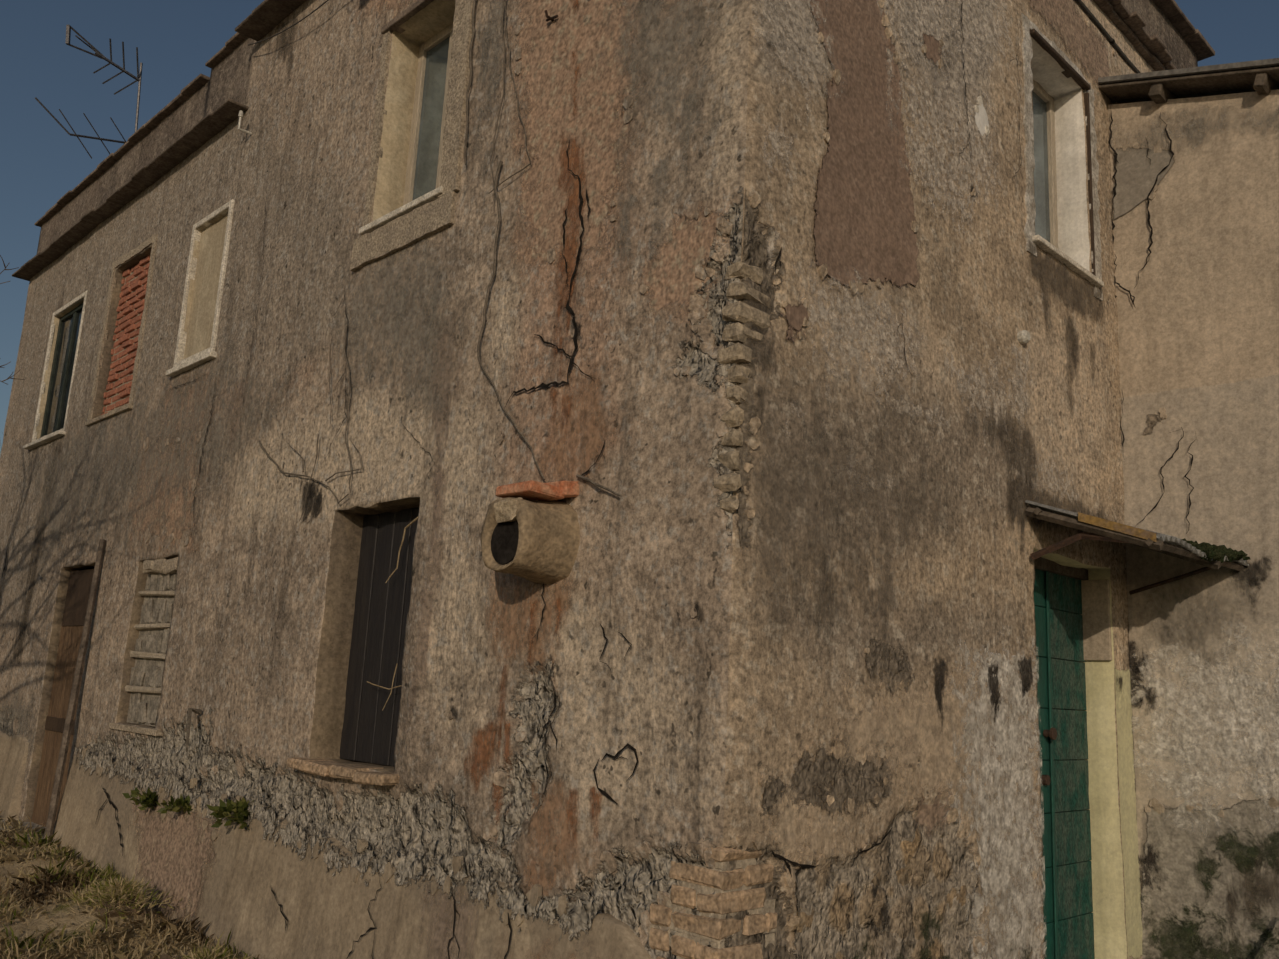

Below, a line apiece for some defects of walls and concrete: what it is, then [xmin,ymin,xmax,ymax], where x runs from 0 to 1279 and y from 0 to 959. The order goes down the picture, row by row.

peeling [809,0,920,296]
crack [1108,107,1174,307]
peeling [639,186,810,549]
leakage [1030,244,1102,410]
crack [1137,427,1196,533]
leakage [988,664,1001,720]
leakage [1018,656,1033,704]
spalling [75,639,1047,959]
crack [772,851,818,877]
crack [851,828,892,868]